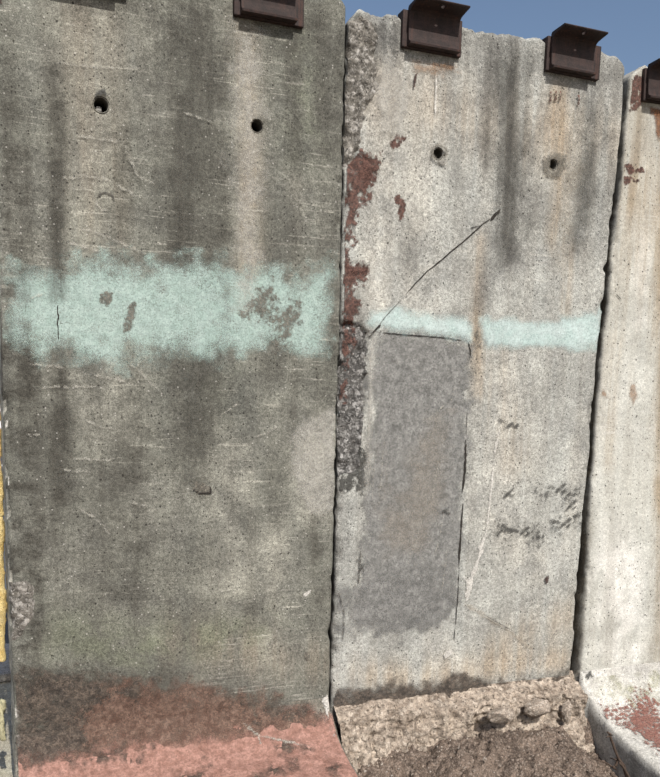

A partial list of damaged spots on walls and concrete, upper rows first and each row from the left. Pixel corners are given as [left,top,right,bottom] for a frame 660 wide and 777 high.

spalling [342,16,379,169]
corrosion [624,163,645,185]
corrosion [629,74,642,112]
corrosion [651,108,660,139]
peeling [239,276,302,346]
corrosion [340,133,406,405]
crack [369,209,501,337]
spalling [336,322,368,478]
leakage [339,447,370,495]
crack [454,423,469,638]